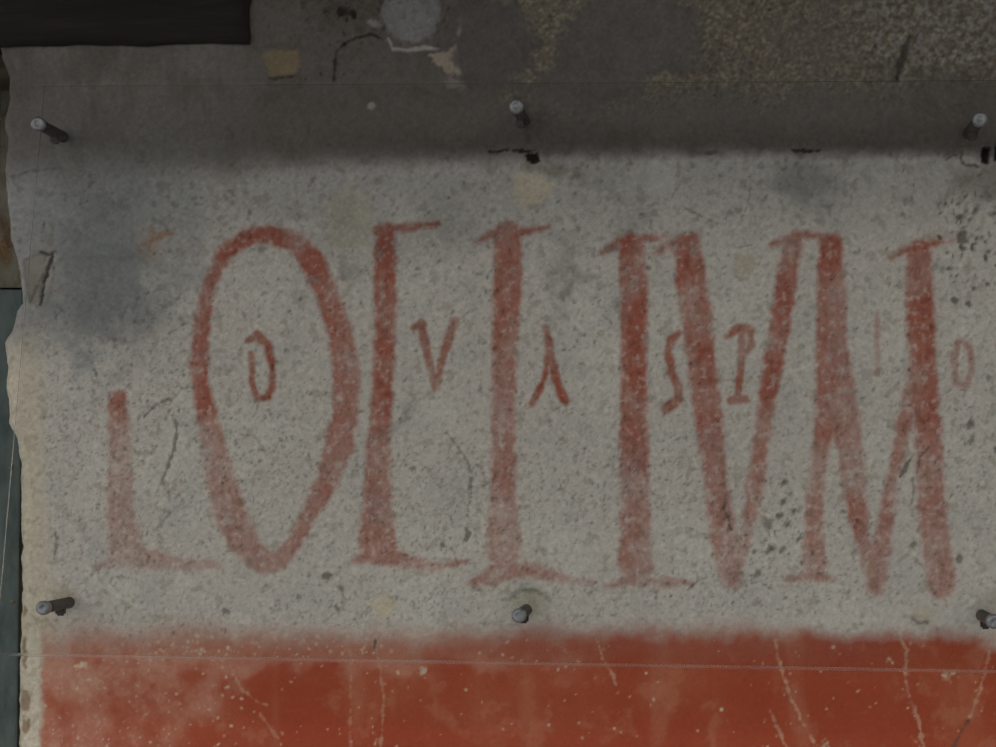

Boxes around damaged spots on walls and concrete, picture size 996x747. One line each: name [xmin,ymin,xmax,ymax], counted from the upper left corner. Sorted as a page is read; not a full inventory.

flaking render [330,0,465,93]
crack [442,425,489,544]
crack [896,626,996,747]